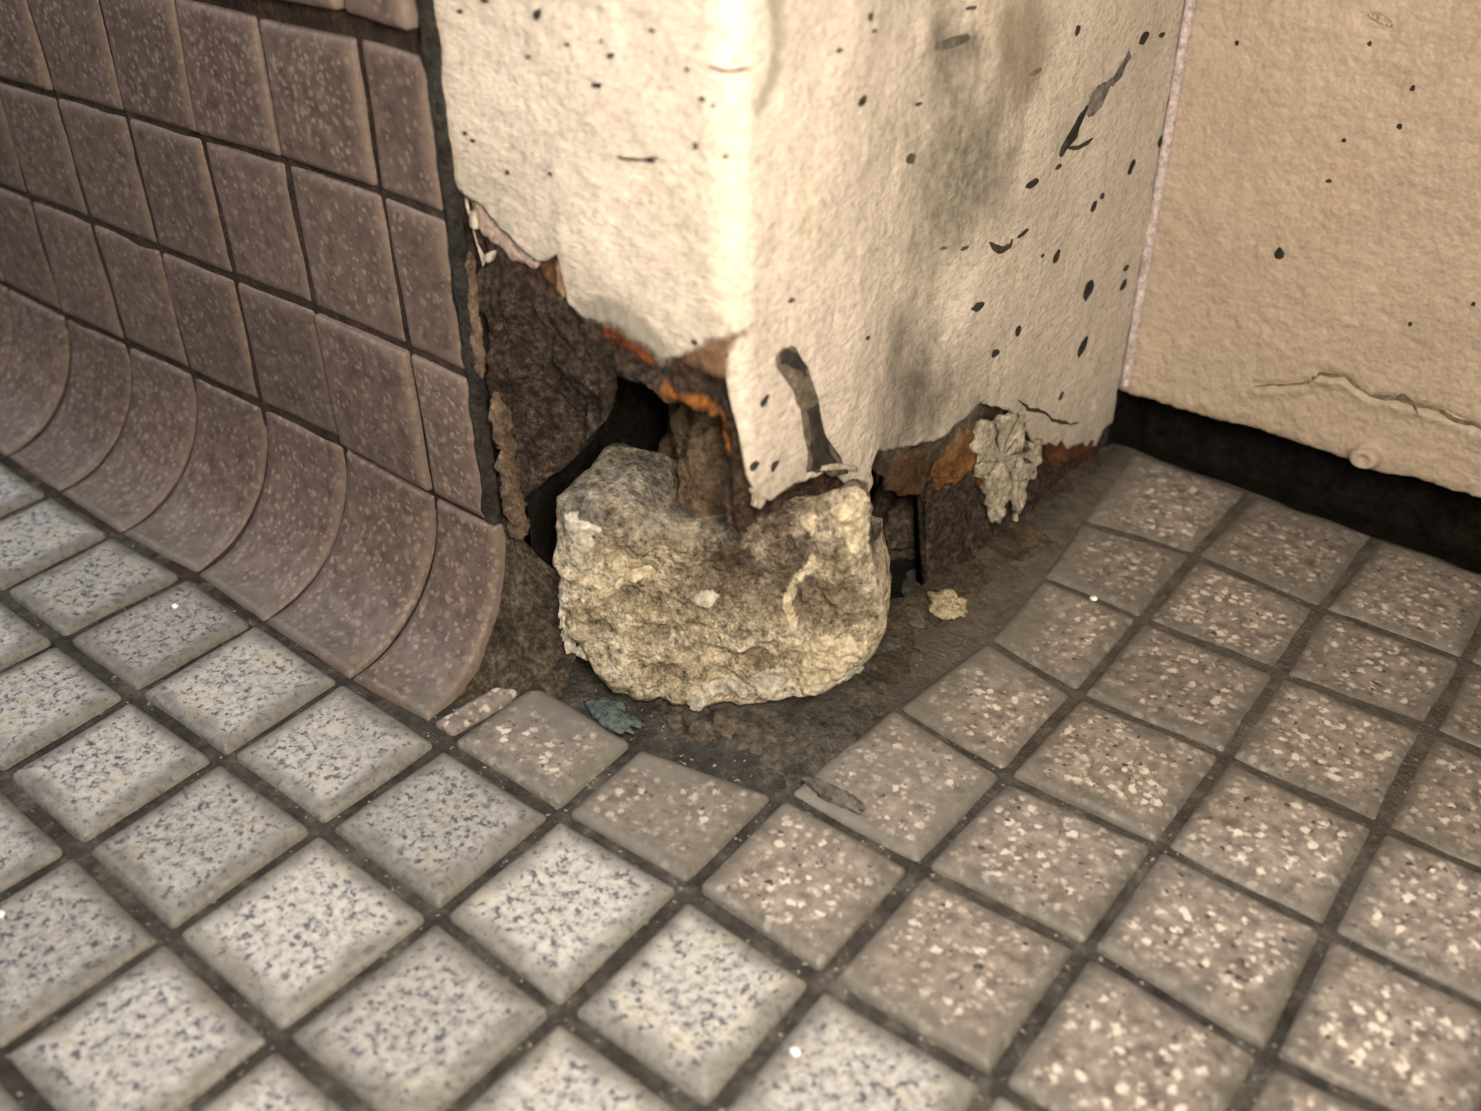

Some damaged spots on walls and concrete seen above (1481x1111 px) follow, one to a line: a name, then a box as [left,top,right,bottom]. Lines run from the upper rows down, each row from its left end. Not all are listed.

water stain [922,13,999,239]
rust [583,299,745,375]
rust [661,380,731,453]
spalling [468,199,1107,585]
water stain [890,321,952,421]
rust [883,426,983,497]
rust [1043,440,1094,466]
crack [1254,372,1481,429]